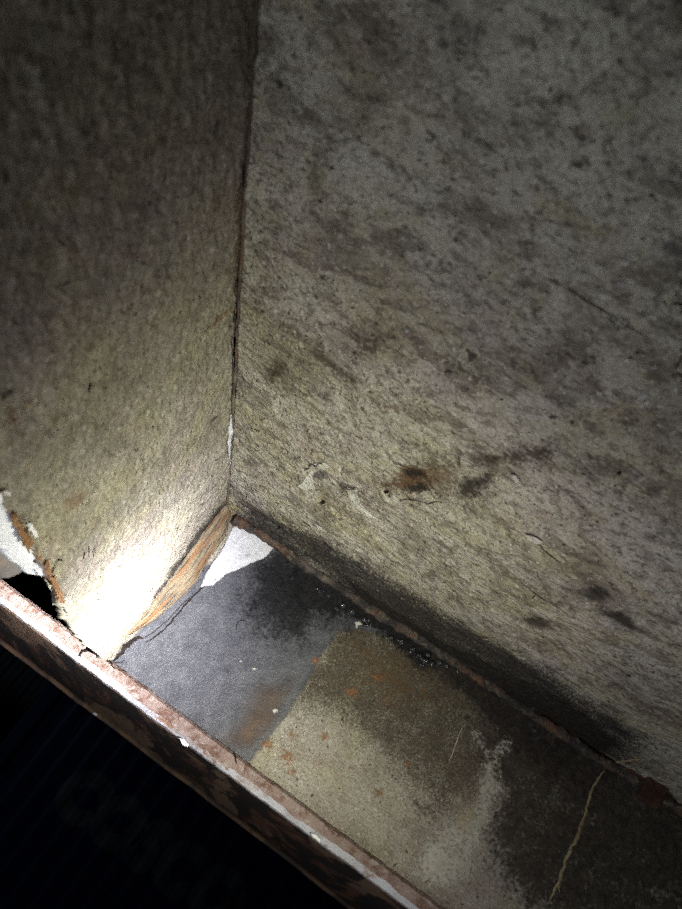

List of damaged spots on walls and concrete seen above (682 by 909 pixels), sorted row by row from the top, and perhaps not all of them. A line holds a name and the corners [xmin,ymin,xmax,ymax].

spalling [0,488,65,604]
water stain [112,548,615,832]
water stain [547,770,605,905]